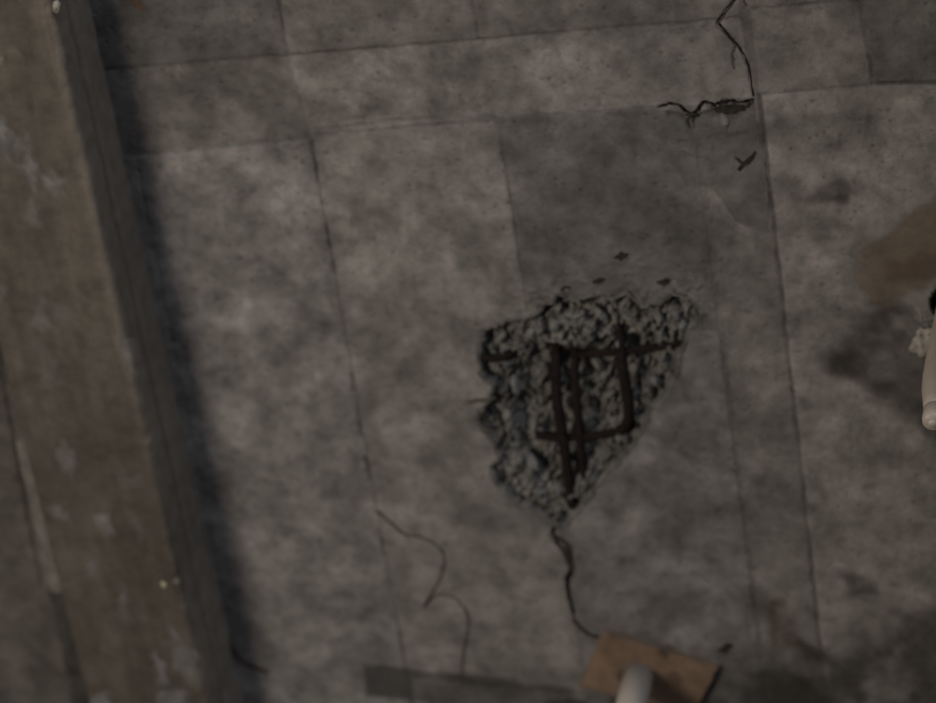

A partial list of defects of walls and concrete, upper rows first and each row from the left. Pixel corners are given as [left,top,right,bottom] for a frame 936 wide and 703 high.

crack [659,0,754,129]
crack [735,151,756,171]
spalling [475,277,707,529]
crack [376,511,469,687]
crack [550,517,600,639]